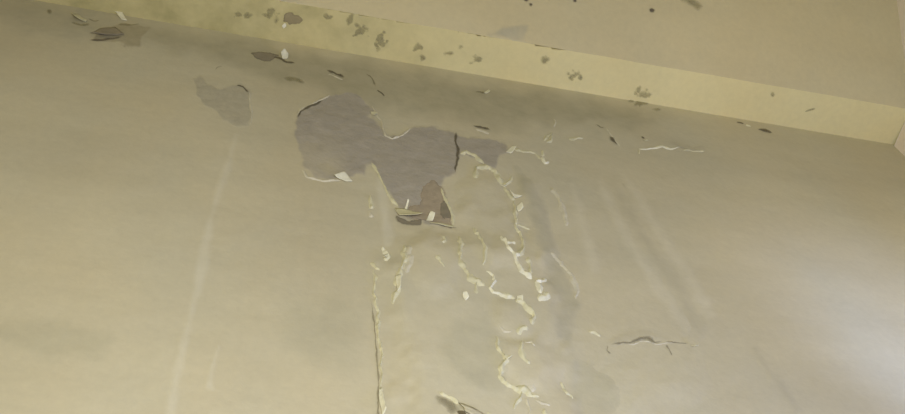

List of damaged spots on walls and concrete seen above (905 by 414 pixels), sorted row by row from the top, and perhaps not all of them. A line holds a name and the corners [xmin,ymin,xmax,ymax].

peeling [90,11,152,49]
peeling [192,75,253,128]
peeling [251,48,294,63]
peeling [292,92,556,414]
leakage [512,165,621,414]
leakage [605,170,720,345]
leakage [430,297,510,405]